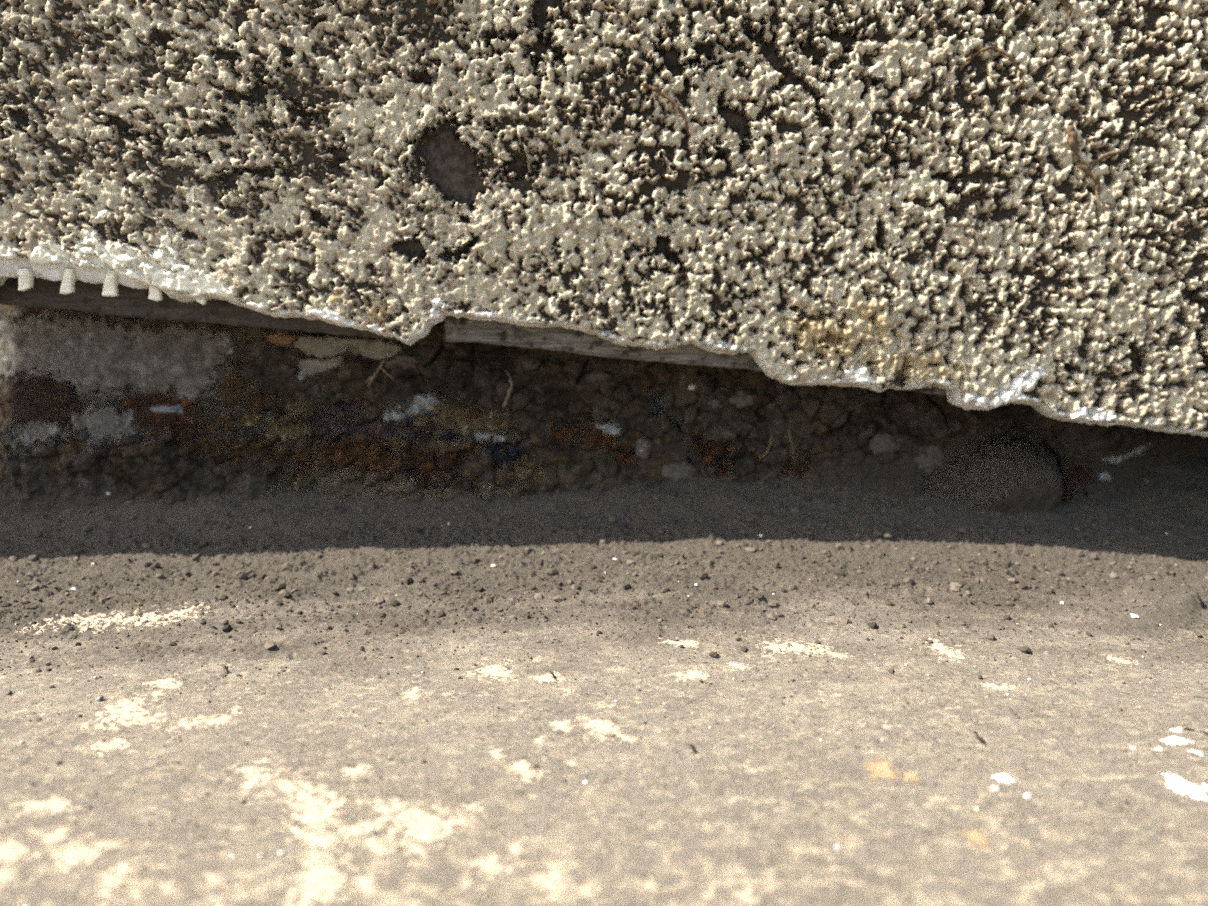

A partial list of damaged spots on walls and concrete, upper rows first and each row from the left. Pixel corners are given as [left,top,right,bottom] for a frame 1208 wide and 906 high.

spalling [330,147,351,168]
spalling [186,187,196,208]
spalling [310,210,337,229]
spalling [0,210,268,311]
spalling [304,308,384,333]